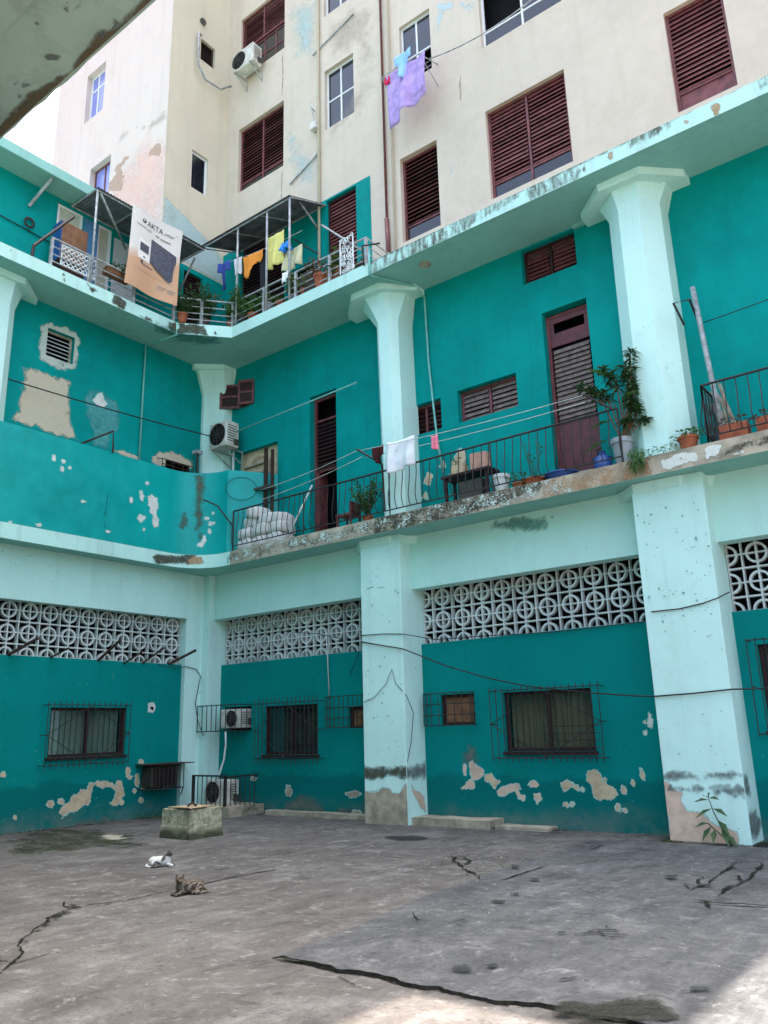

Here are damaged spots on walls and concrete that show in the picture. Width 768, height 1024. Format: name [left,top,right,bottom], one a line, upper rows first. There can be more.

flaking render [12,322,80,438]
damp [227,481,543,563]
peeling [46,759,145,819]
damp [364,763,426,780]
peeling [461,760,542,805]
peeling [560,767,646,813]
flaking render [664,781,740,844]
damp [664,772,749,797]
damp [749,812,761,836]
crack [684,860,767,906]
crack [0,889,175,973]
crack [277,961,519,1008]